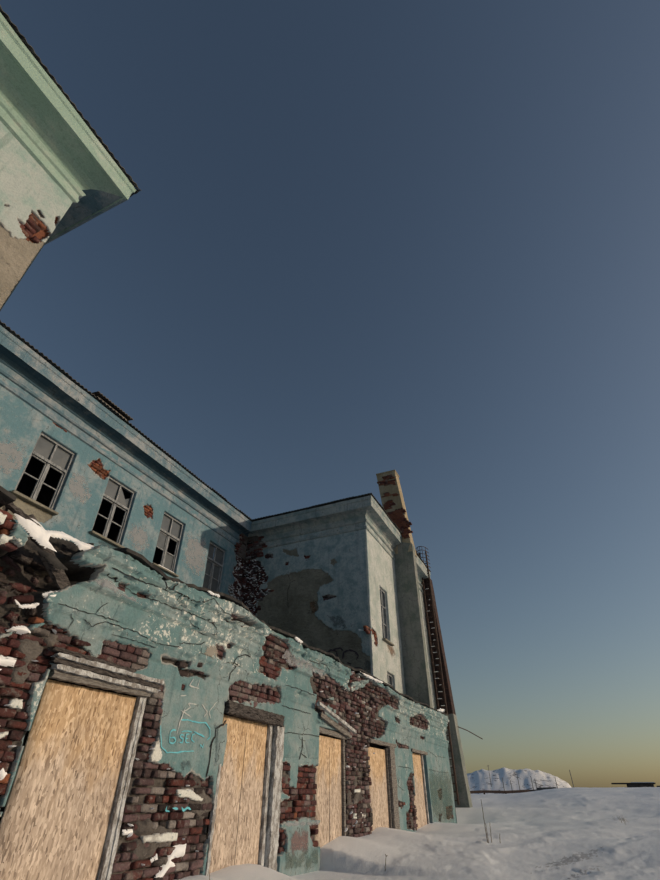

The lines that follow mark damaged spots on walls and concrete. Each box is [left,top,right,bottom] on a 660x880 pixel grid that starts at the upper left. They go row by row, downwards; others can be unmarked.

flaking render [0,210,58,310]
spalling [87,459,110,480]
spalling [377,474,413,539]
spalling [0,497,153,796]
crack [58,567,250,680]
spalling [162,657,207,690]
spalling [224,533,429,837]
spalling [110,685,213,880]
spalling [277,762,318,854]